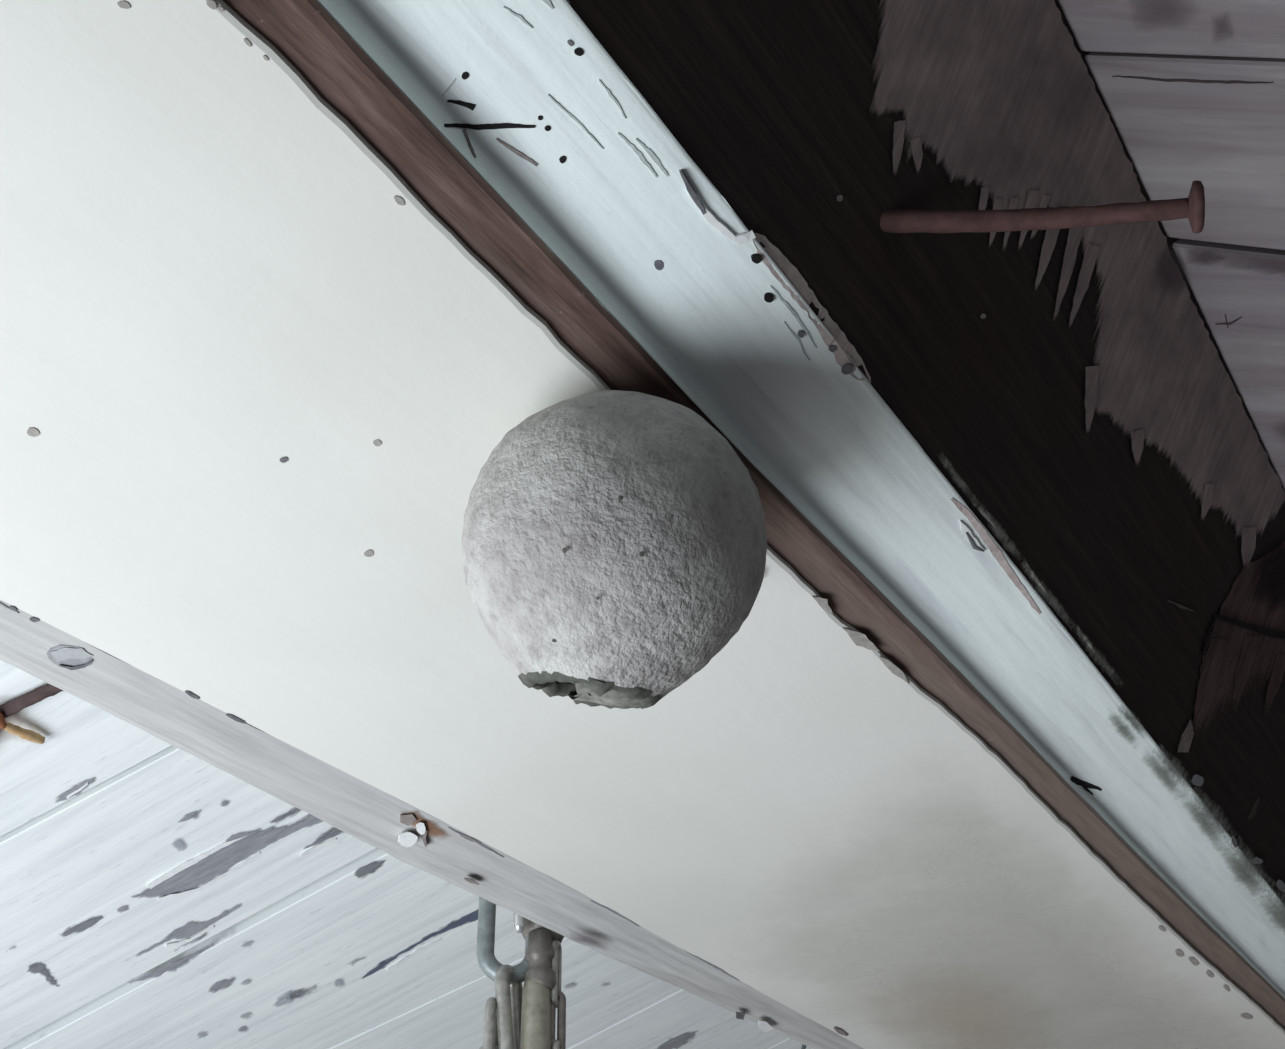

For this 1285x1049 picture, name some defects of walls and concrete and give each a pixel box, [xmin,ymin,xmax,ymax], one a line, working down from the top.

peeling [599,79,871,383]
peeling [943,459,1068,620]
peeling [46,645,94,670]
spalling [398,814,444,847]
peeling [117,808,343,912]
peeling [355,860,385,877]
peeling [61,916,103,937]
peeling [130,905,241,983]
peeling [352,910,478,979]
peeling [27,963,58,986]
peeling [210,977,250,993]
peeling [275,986,316,1006]